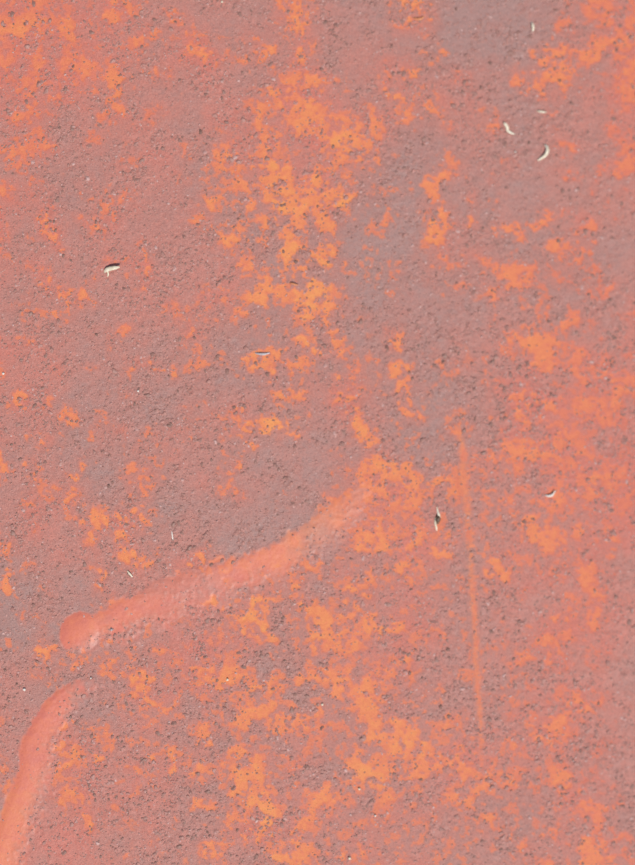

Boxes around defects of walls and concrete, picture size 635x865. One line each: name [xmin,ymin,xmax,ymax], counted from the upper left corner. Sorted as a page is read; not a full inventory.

rust [506,0,635,127]
rust [24,178,142,258]